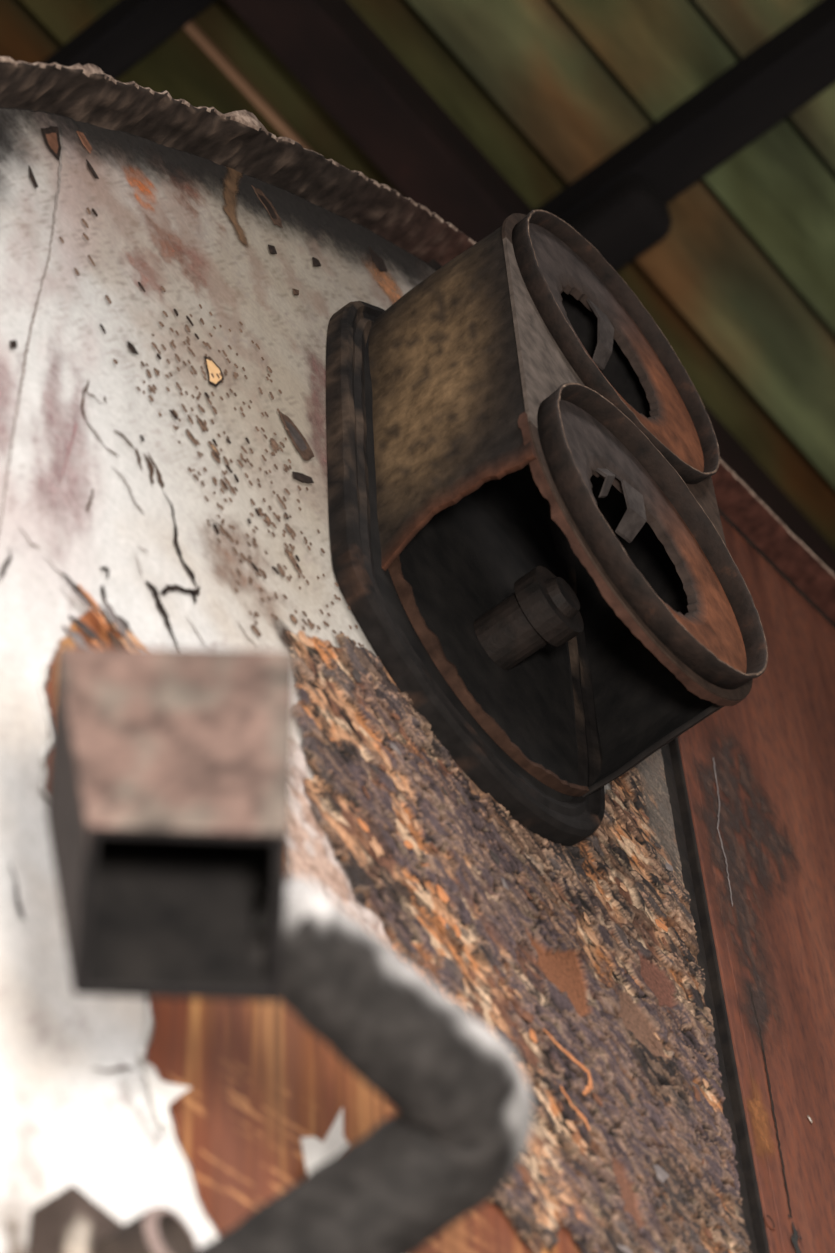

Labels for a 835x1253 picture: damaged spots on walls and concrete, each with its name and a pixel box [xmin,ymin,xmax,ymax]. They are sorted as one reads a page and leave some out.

spalling [81,207,98,267]
crack [0,133,63,581]
crack [81,380,206,649]
spalling [127,304,364,647]
peeling [39,573,147,801]
peeling [286,739,393,948]
peeling [713,757,733,907]
peeling [138,997,397,1240]
corrosion [543,1028,593,1131]
peeling [415,1200,583,1253]
peeling [788,1215,802,1253]